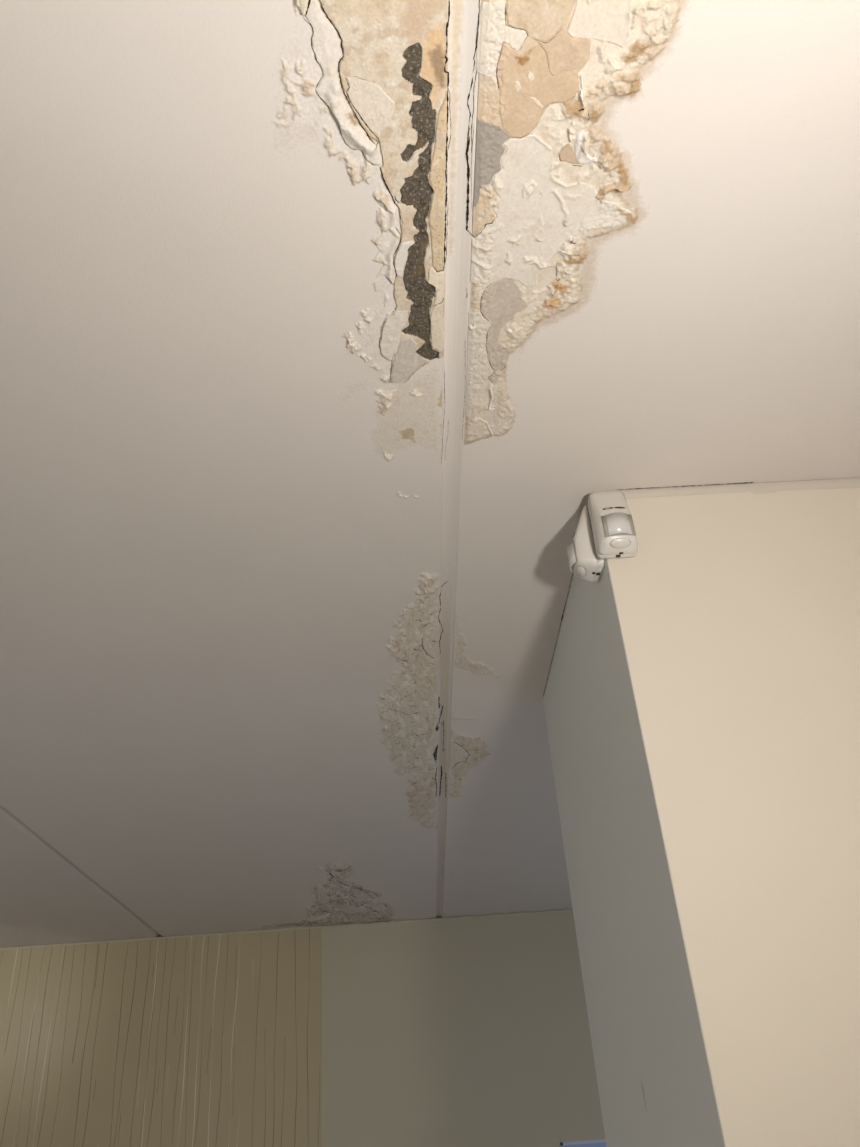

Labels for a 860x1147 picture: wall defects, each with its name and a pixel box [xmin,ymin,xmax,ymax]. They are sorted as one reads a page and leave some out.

crack [303,0,408,278]
peeling [270,0,449,383]
crack [379,325,465,464]
crack [408,283,511,382]
crack [433,0,557,272]
peeling [462,0,683,449]
damp [516,0,693,366]
crack [377,579,489,828]
peeling [375,572,493,829]
peeling [255,861,422,930]